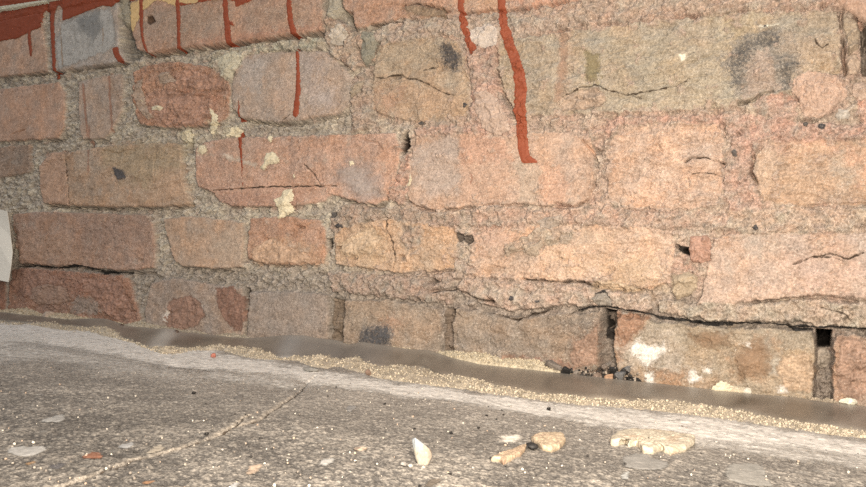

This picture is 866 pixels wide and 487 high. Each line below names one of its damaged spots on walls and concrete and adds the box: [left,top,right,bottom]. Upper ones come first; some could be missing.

crack [794,253,863,265]
crack [180,385,307,450]